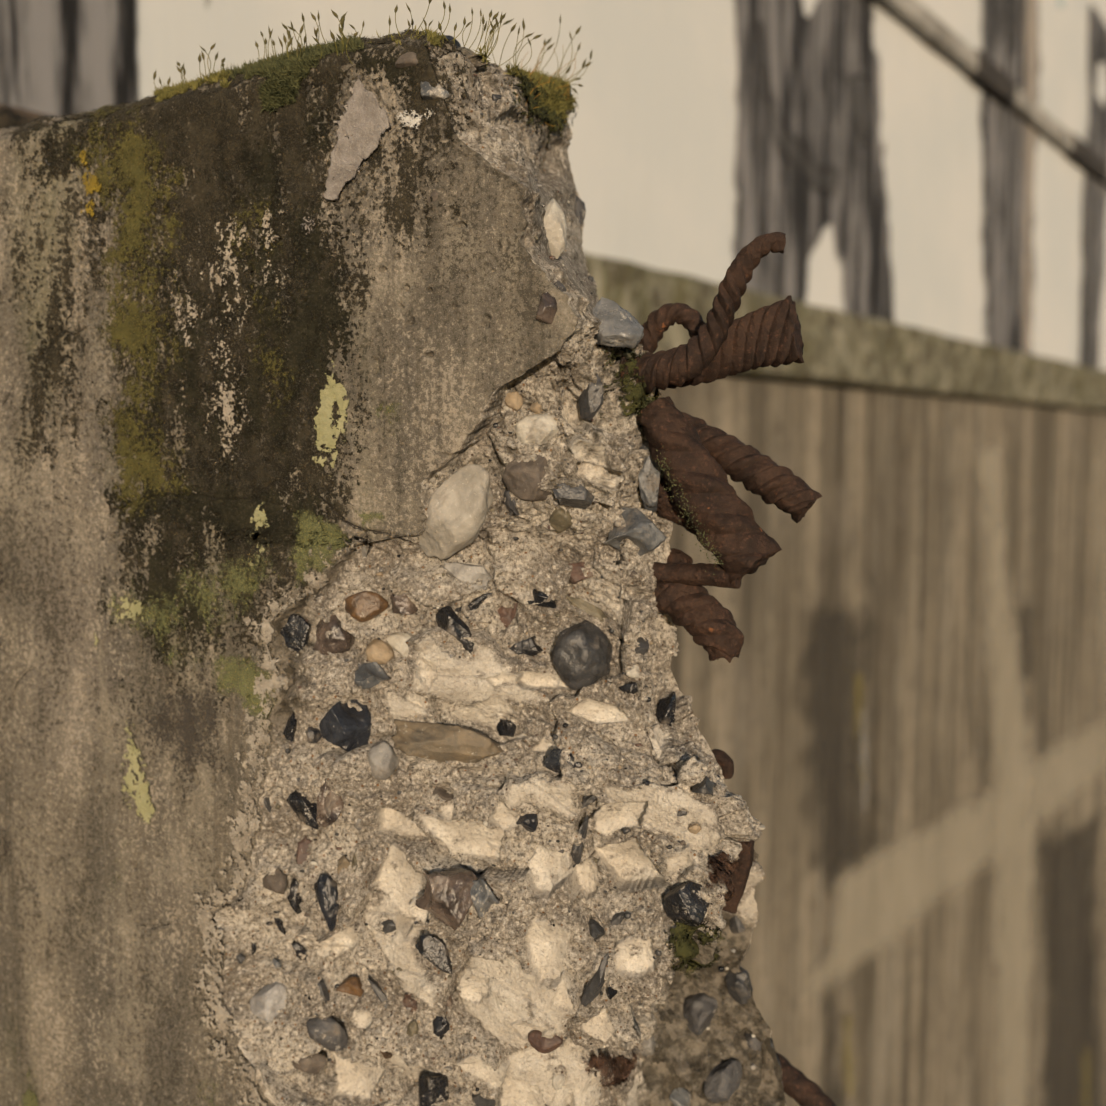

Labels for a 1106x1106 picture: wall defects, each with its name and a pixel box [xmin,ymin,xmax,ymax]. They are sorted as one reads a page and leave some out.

damp [0,29,483,804]
crack [108,478,421,555]
spalling [188,35,786,1106]
rust [620,232,822,663]
rust [775,1051,836,1106]